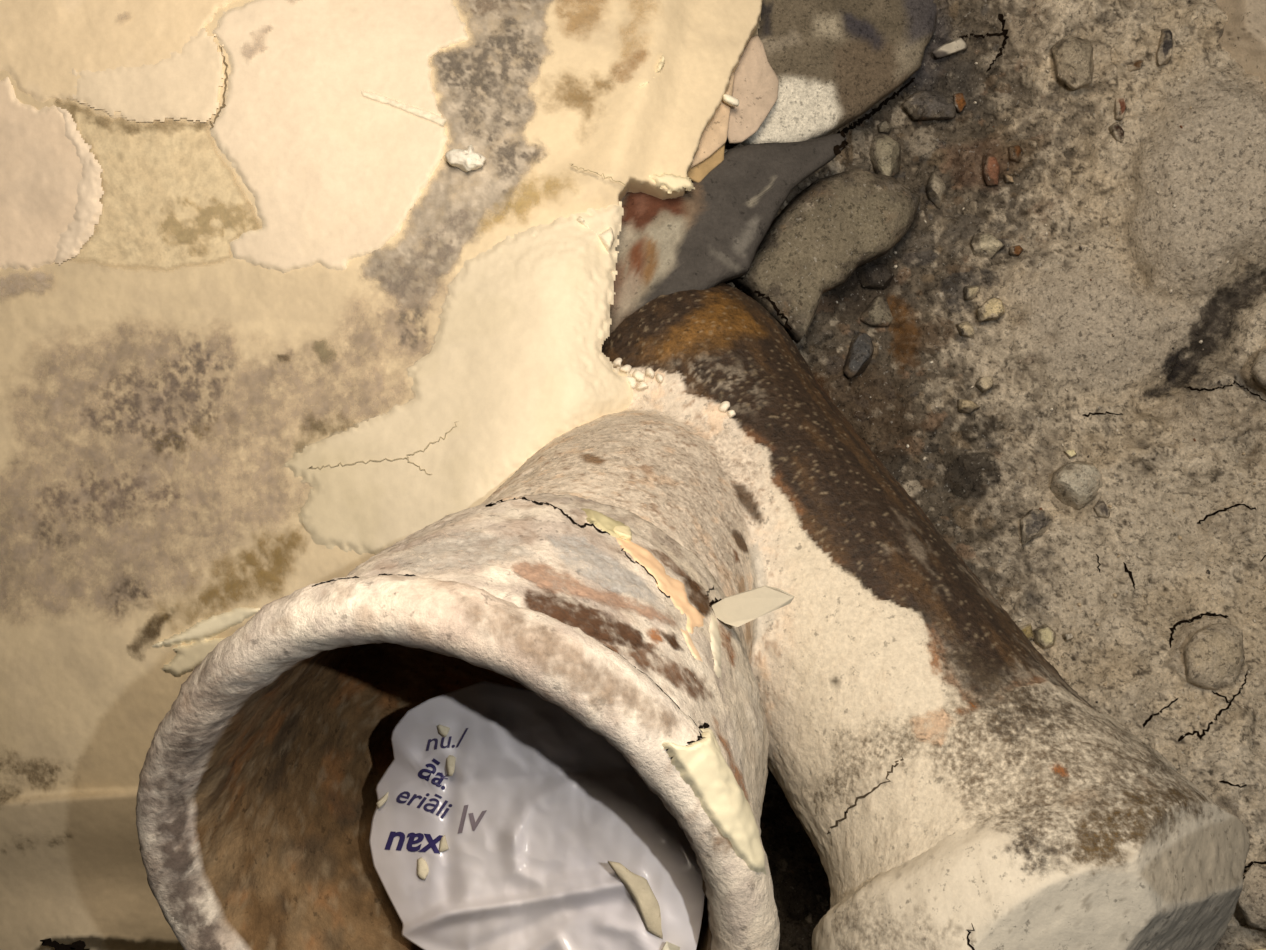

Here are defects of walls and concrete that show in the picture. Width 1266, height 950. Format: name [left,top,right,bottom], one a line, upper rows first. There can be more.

peeling [0,0,469,274]
damp [0,0,610,614]
crack [1187,380,1266,401]
crack [1197,504,1256,524]
crack [485,497,670,598]
crack [706,586,722,606]
damp [128,614,170,652]
crack [1169,612,1228,648]
crack [1143,669,1249,742]
crack [1243,861,1266,880]